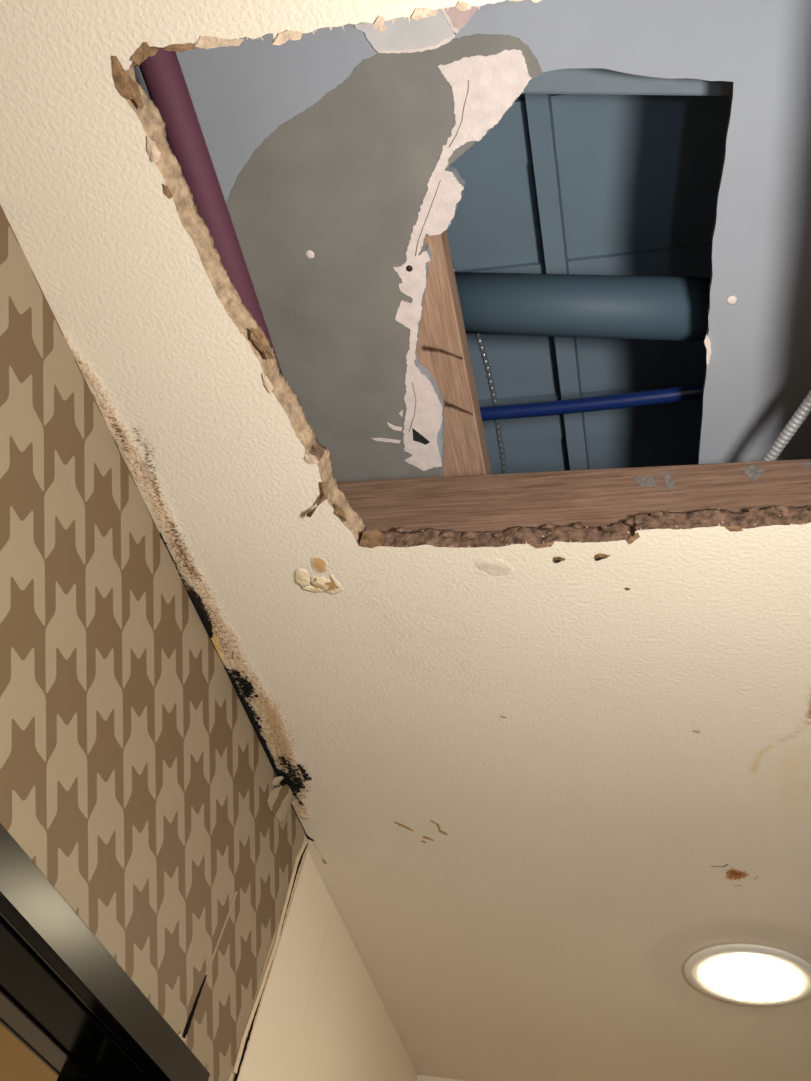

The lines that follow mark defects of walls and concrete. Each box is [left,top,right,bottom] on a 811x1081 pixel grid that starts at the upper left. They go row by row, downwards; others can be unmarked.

spalling [111,1,811,548]
water stain [108,416,165,506]
flaking render [60,325,318,824]
water stain [160,521,312,838]
crack [230,834,327,1081]